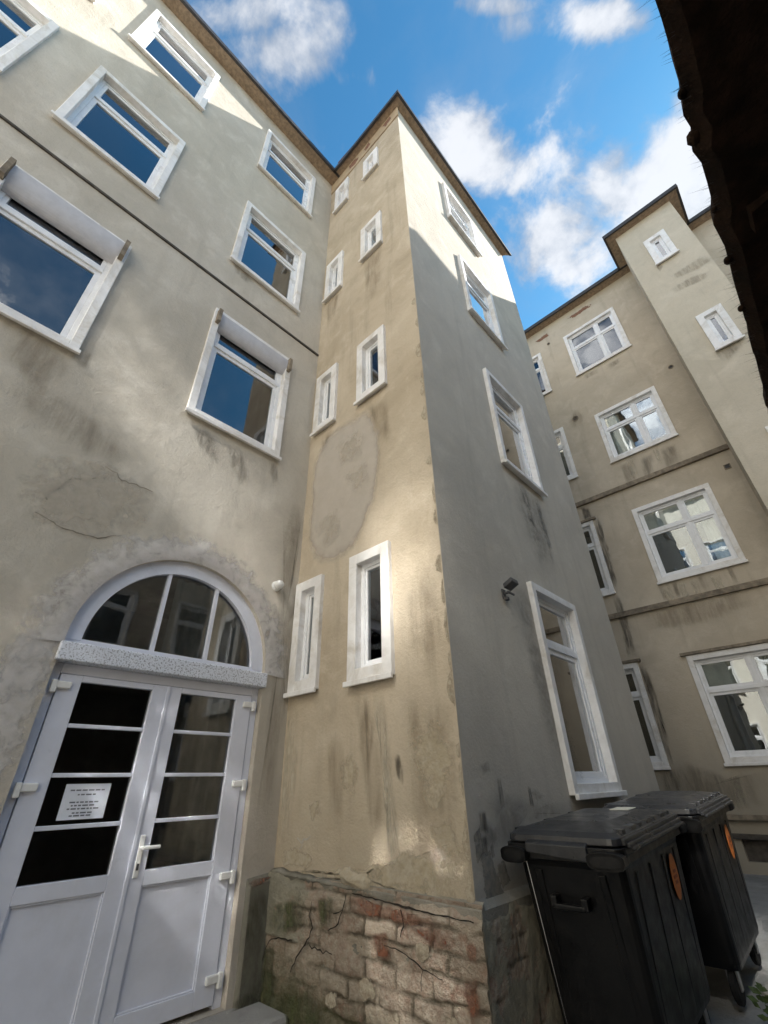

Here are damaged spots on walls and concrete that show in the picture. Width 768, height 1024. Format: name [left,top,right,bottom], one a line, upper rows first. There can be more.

crack [35,466,153,539]
crack [262,893,474,992]
flaking render [260,812,510,1024]